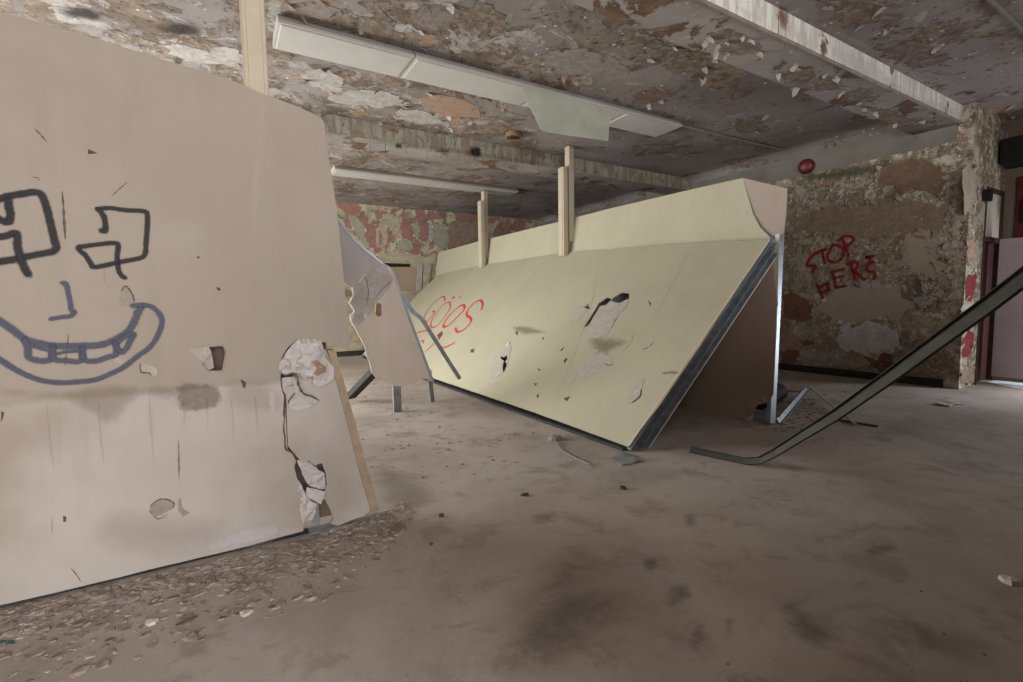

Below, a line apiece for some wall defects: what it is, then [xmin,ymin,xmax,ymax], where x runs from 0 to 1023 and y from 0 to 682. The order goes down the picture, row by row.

peeling [280,0,345,24]
peeling [153,42,243,72]
peeling [640,28,765,92]
peeling [300,69,512,137]
peeling [772,63,930,129]
peeling [876,159,977,215]
peeling [348,205,438,267]
peeling [449,219,478,249]
spalling [775,215,947,368]
peeling [960,240,981,314]
peeling [960,327,978,385]
crack [280,372,318,460]